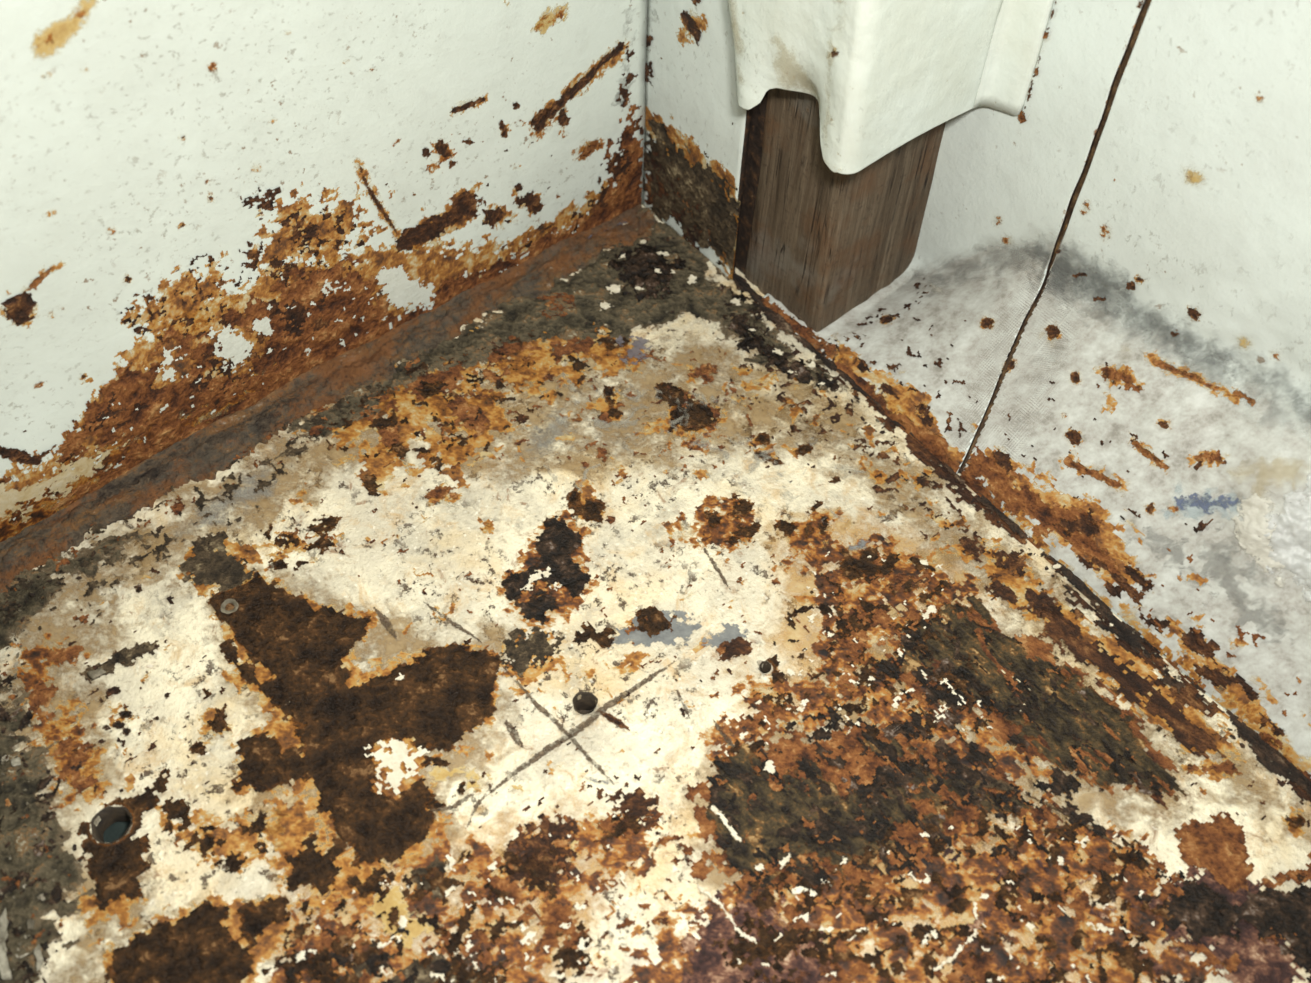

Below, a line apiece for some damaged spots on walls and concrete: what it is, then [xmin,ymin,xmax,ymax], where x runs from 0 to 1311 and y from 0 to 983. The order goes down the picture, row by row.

rust [32,0,96,78]
rust [0,40,740,542]
peeling [653,382,728,455]
peeling [832,539,897,590]
peeling [1231,475,1311,601]
rust [0,278,1311,983]
peeling [42,509,651,983]
peeling [884,593,1187,810]
peeling [682,705,1115,944]
peeling [0,907,12,980]
peeling [933,902,978,971]
peeling [1143,865,1311,983]